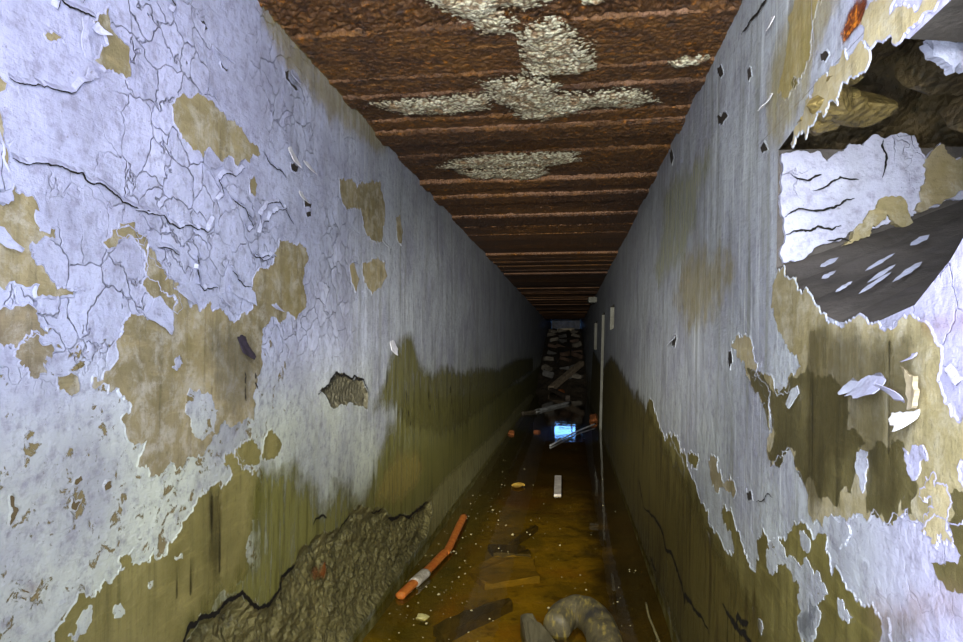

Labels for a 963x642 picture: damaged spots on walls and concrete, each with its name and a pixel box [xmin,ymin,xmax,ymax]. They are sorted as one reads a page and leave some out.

crack [8,72,94,94]
crack [51,0,97,18]
peeling [169,91,261,198]
crack [742,0,766,32]
rust [841,0,867,41]
crack [11,150,295,291]
peeling [0,109,309,479]
spalling [319,370,369,411]
peeling [639,0,963,642]
peeling [42,428,433,642]
water stain [193,338,540,642]
water stain [590,352,760,642]